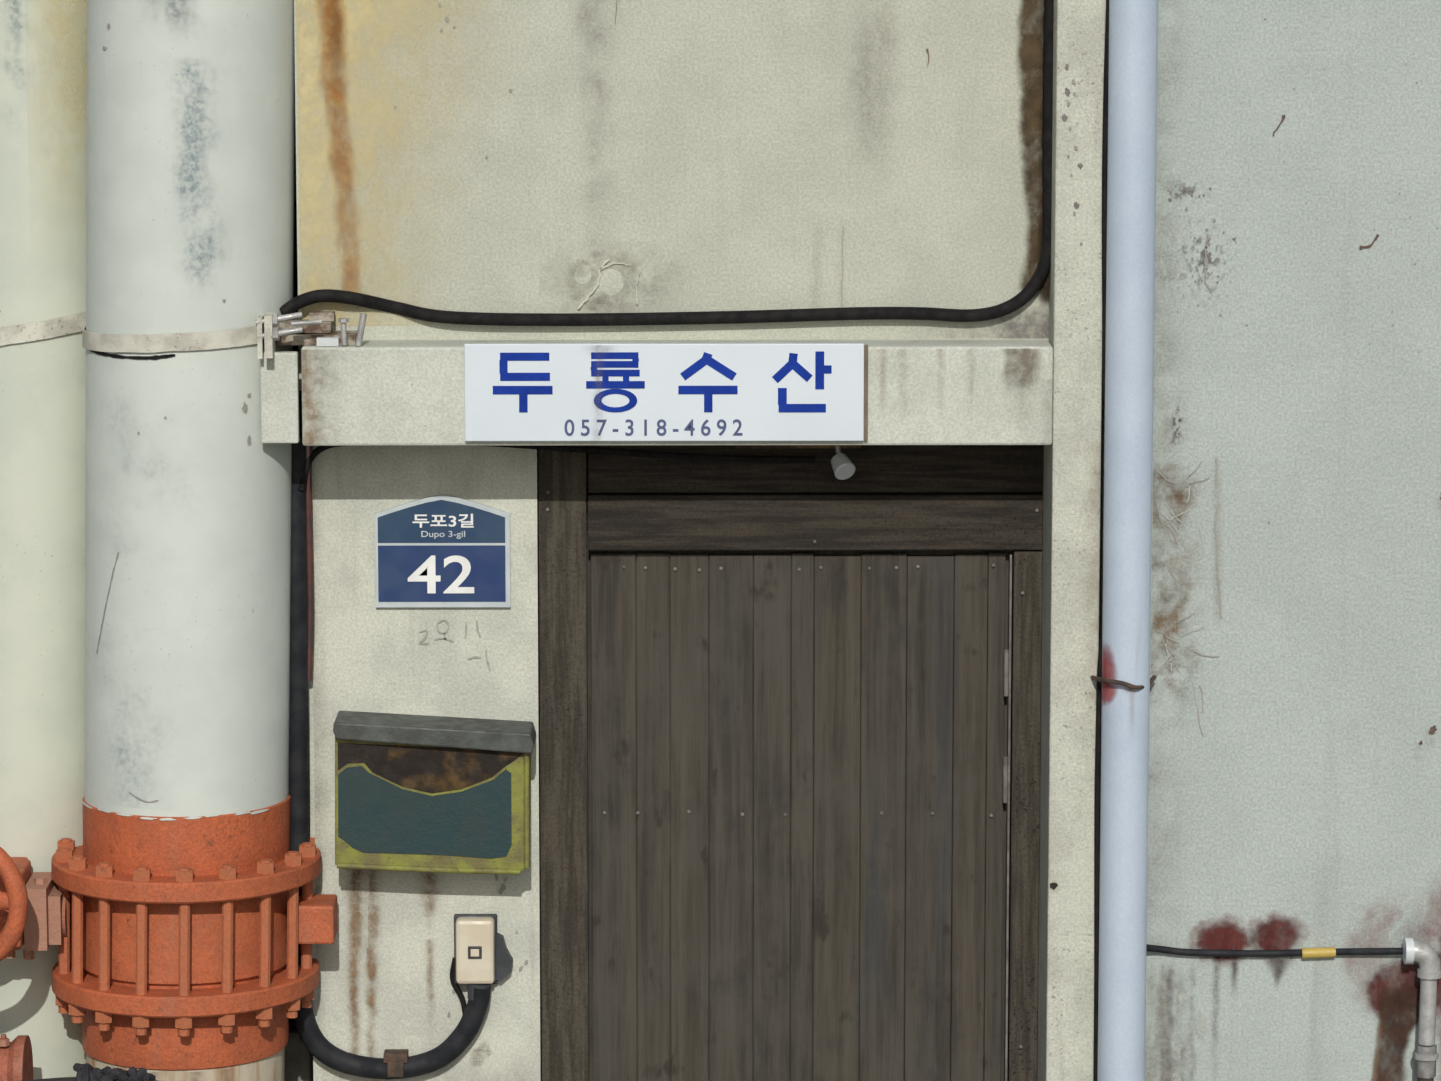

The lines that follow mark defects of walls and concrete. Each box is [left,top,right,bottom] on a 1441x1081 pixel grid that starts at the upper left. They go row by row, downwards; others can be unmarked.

rust [296,0,421,326]
damp [1006,0,1050,380]
rust [1102,650,1130,701]
rust [350,870,377,1027]
rust [1199,920,1297,976]
rust [1368,961,1420,1081]